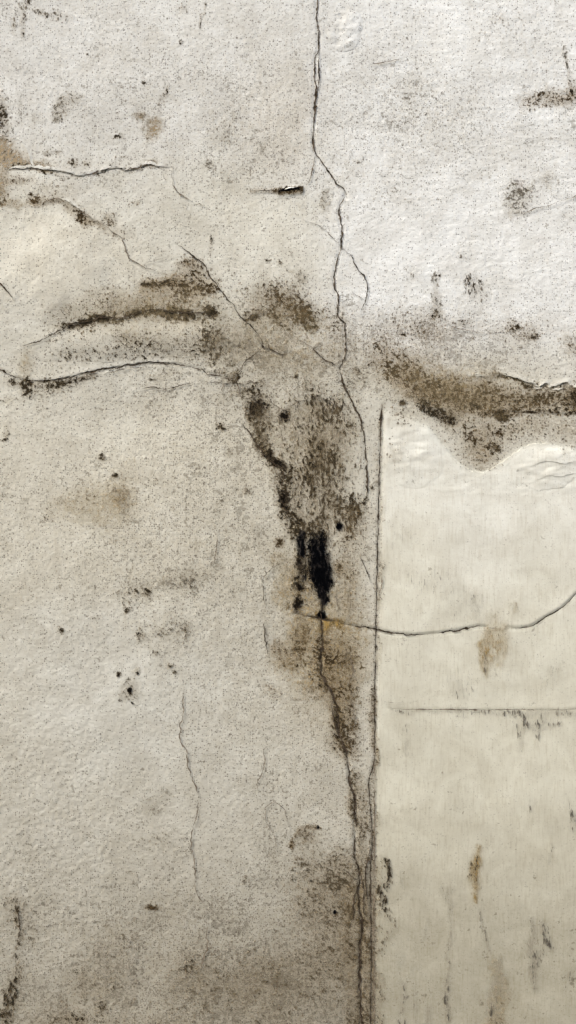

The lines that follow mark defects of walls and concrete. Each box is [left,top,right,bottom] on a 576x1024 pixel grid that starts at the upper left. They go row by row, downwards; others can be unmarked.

crack [37,198,158,271]
crack [17,164,205,206]
spalling [251,184,304,199]
crack [0,244,291,401]
leakage [41,235,344,342]
leakage [363,271,576,468]
crack [242,424,291,521]
crack [293,0,575,1024]
mould [116,583,153,614]
mould [136,622,194,653]
leakage [231,382,396,1024]
crack [179,696,209,972]